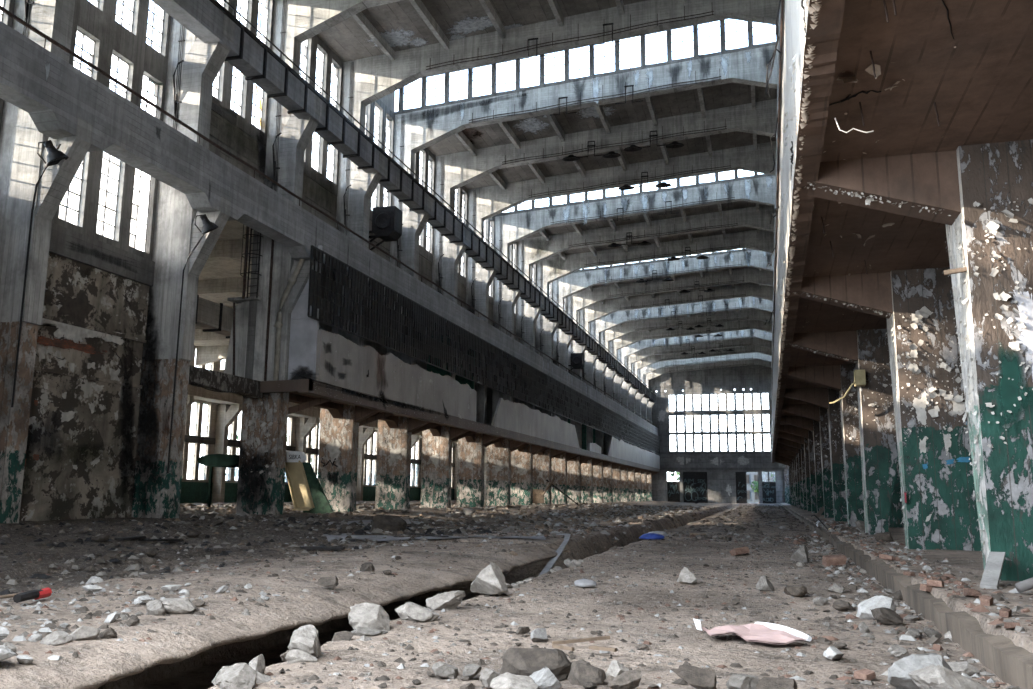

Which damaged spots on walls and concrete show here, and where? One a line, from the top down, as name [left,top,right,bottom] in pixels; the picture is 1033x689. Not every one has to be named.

water stain [671,58,727,83]
water stain [575,81,615,117]
spalling [773,0,1033,516]
peeling [37,281,125,373]
peeling [60,392,75,422]
peeling [88,368,120,414]
peeling [376,430,407,505]